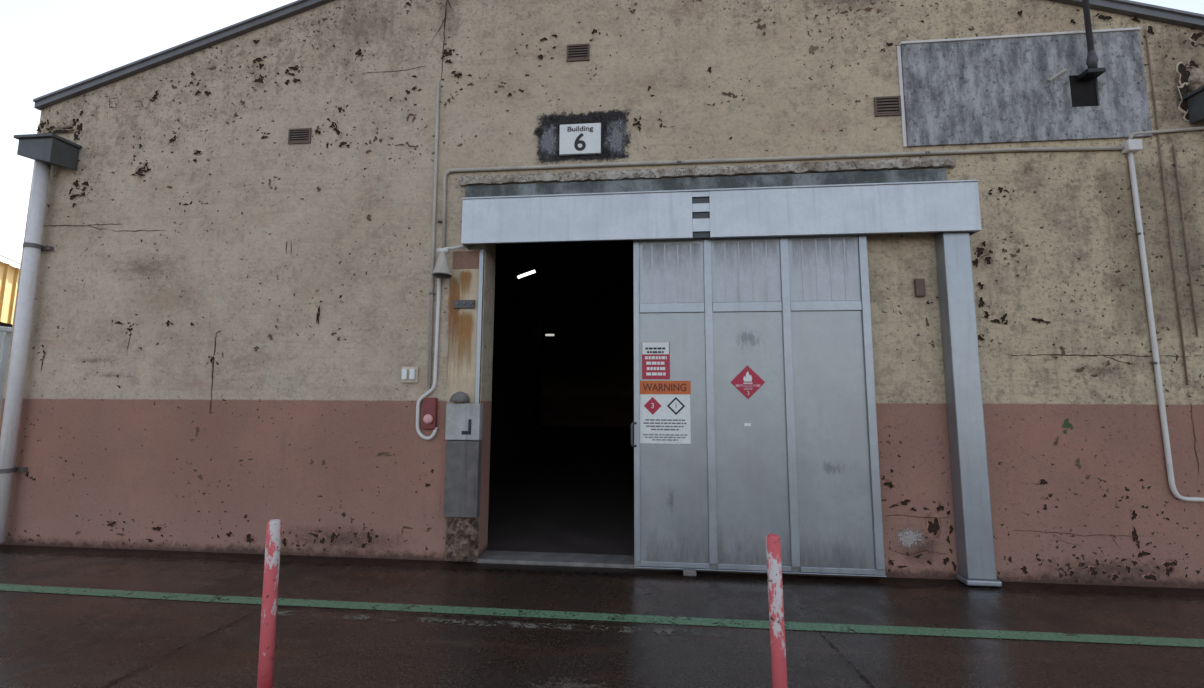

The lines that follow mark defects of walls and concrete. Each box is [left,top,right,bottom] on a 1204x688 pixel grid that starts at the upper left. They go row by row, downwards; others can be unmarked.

spalling [36,110,89,161]
spalling [47,178,96,217]
crack [46,224,160,232]
spalling [130,137,173,190]
spalling [149,55,235,153]
spalling [226,38,369,125]
spalling [1172,29,1204,126]
corrosion [448,271,472,353]
spalling [1053,417,1074,446]
spalling [878,440,957,573]
spalling [1056,478,1204,582]